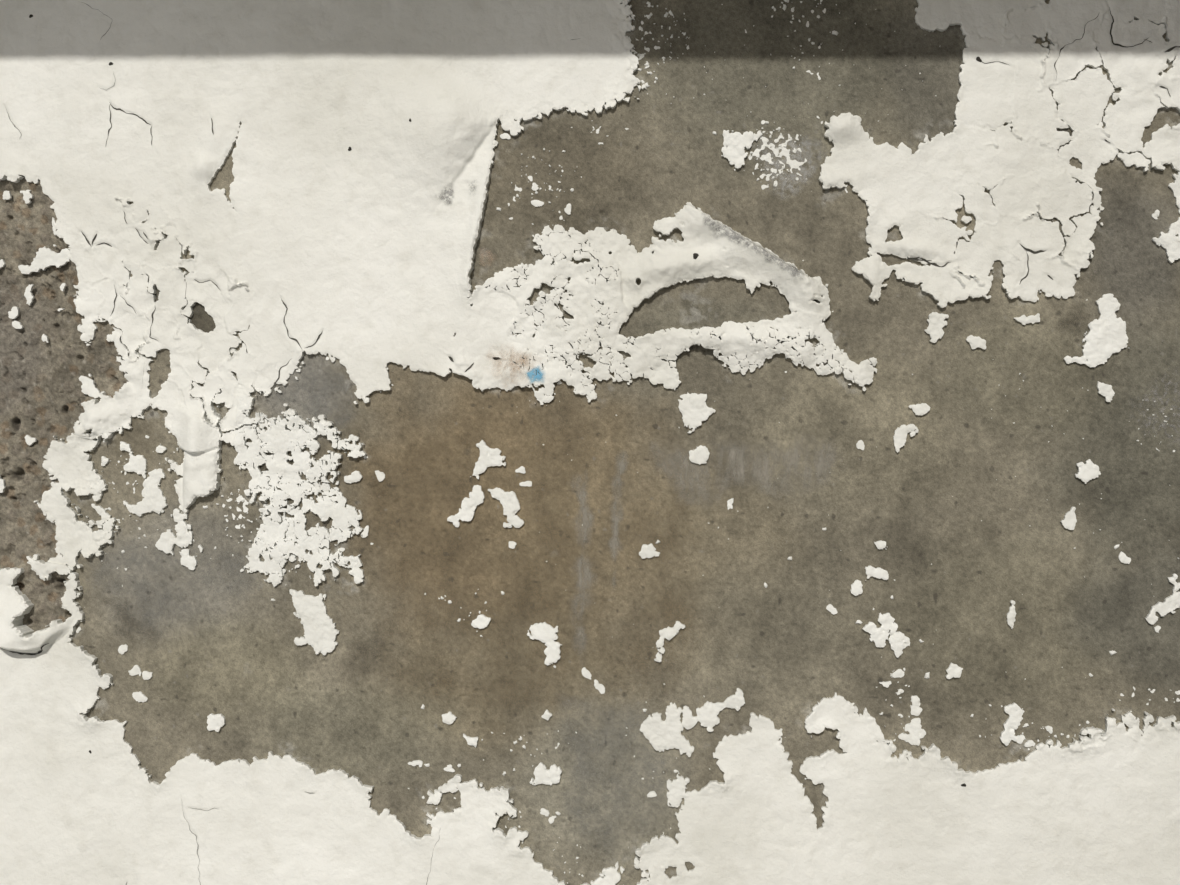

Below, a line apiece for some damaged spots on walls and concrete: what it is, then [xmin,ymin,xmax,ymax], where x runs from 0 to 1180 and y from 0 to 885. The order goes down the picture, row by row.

crack [1033,7,1180,160]
peeling [1141,107,1180,148]
spalling [0,176,150,632]
crack [81,202,218,359]
peeling [147,349,171,398]
peeling [187,302,216,333]
crack [193,330,338,562]
crack [270,299,323,392]
peeling [234,396,367,587]
spalling [441,202,877,405]
crack [907,189,994,278]
crack [1019,180,1092,285]